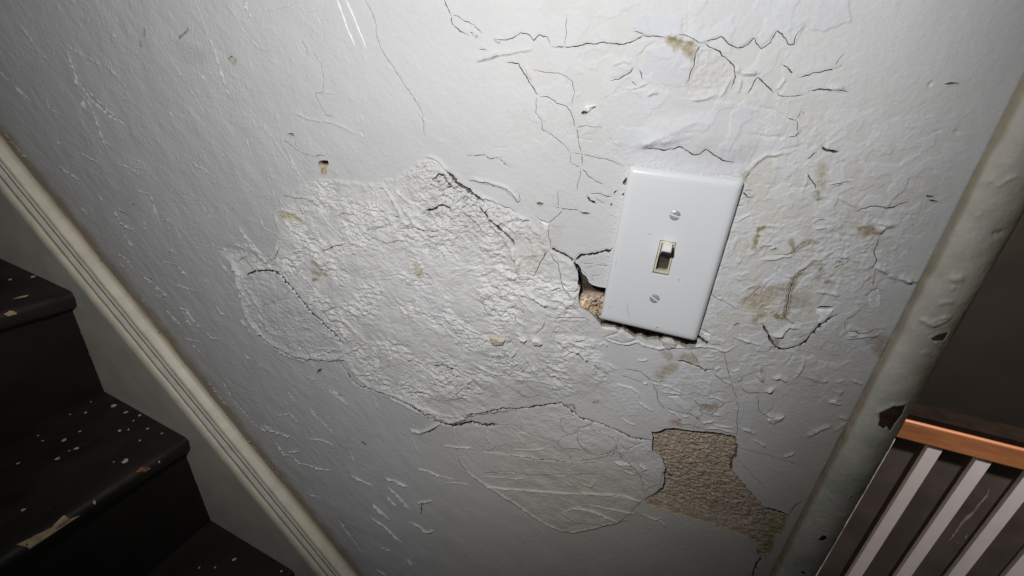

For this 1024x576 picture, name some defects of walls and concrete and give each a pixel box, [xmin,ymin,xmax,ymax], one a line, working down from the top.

leakage [669,37,693,56]
flaking render [317,159,330,176]
crack [322,0,852,336]
crack [235,245,651,492]
crack [591,199,910,437]
peeling [878,405,905,430]
flaking render [644,427,792,559]